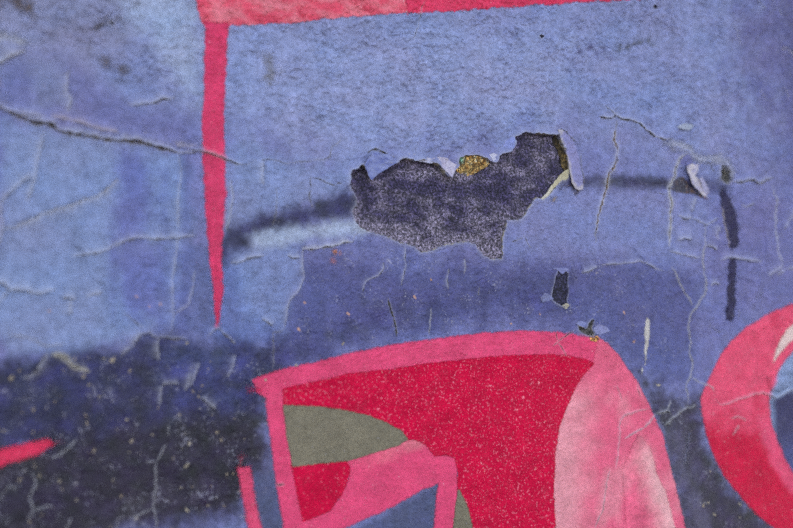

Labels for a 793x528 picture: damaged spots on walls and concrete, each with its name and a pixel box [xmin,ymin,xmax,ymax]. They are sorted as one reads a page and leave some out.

crack [0,39,26,66]
peeling [341,124,583,265]
peeling [671,154,709,198]
peeling [721,165,730,183]
crack [0,69,343,409]
peeling [541,268,570,310]
crack [560,105,793,528]
crack [50,438,78,458]
crack [0,471,54,521]
crack [115,425,170,528]